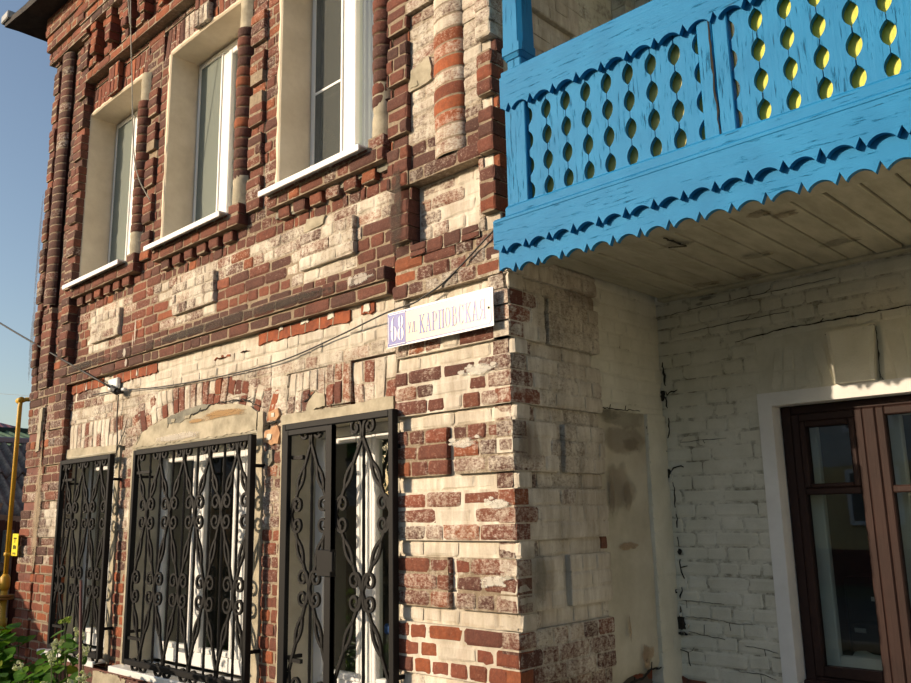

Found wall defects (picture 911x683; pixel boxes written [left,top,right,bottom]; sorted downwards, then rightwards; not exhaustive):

crack [668,278,911,380]
peeling [167,404,211,424]
crack [603,362,723,443]
crack [670,465,775,683]
crack [630,662,662,683]